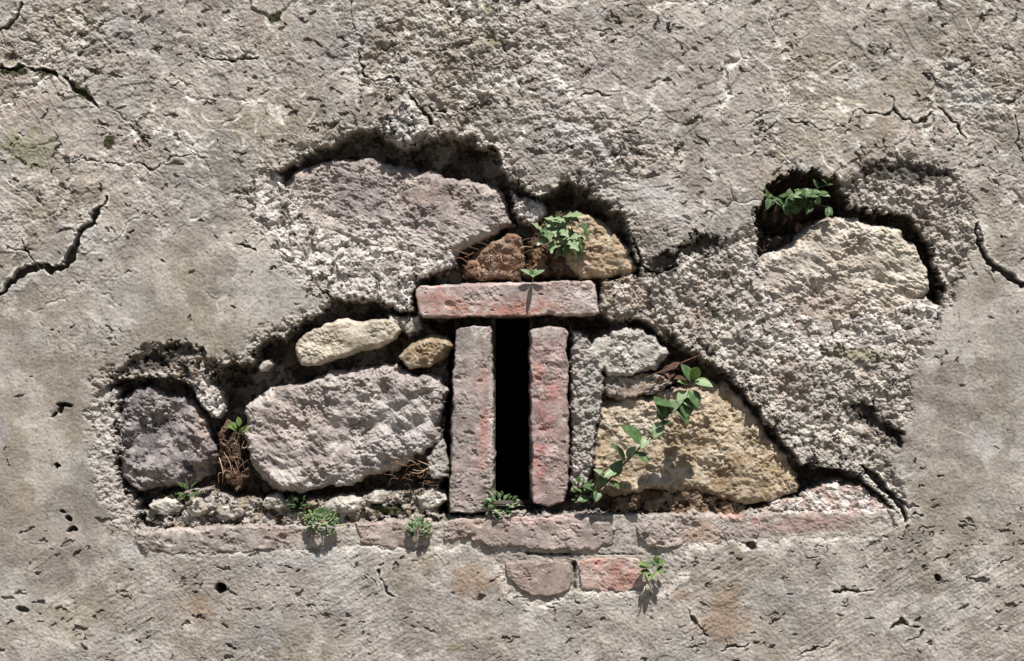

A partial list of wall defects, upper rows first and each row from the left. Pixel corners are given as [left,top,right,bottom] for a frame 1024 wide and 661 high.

crack [0,63,100,109]
crack [763,93,968,140]
crack [0,196,138,296]
crack [974,221,1024,289]
flaking render [76,127,985,611]
spalling [890,617,926,646]